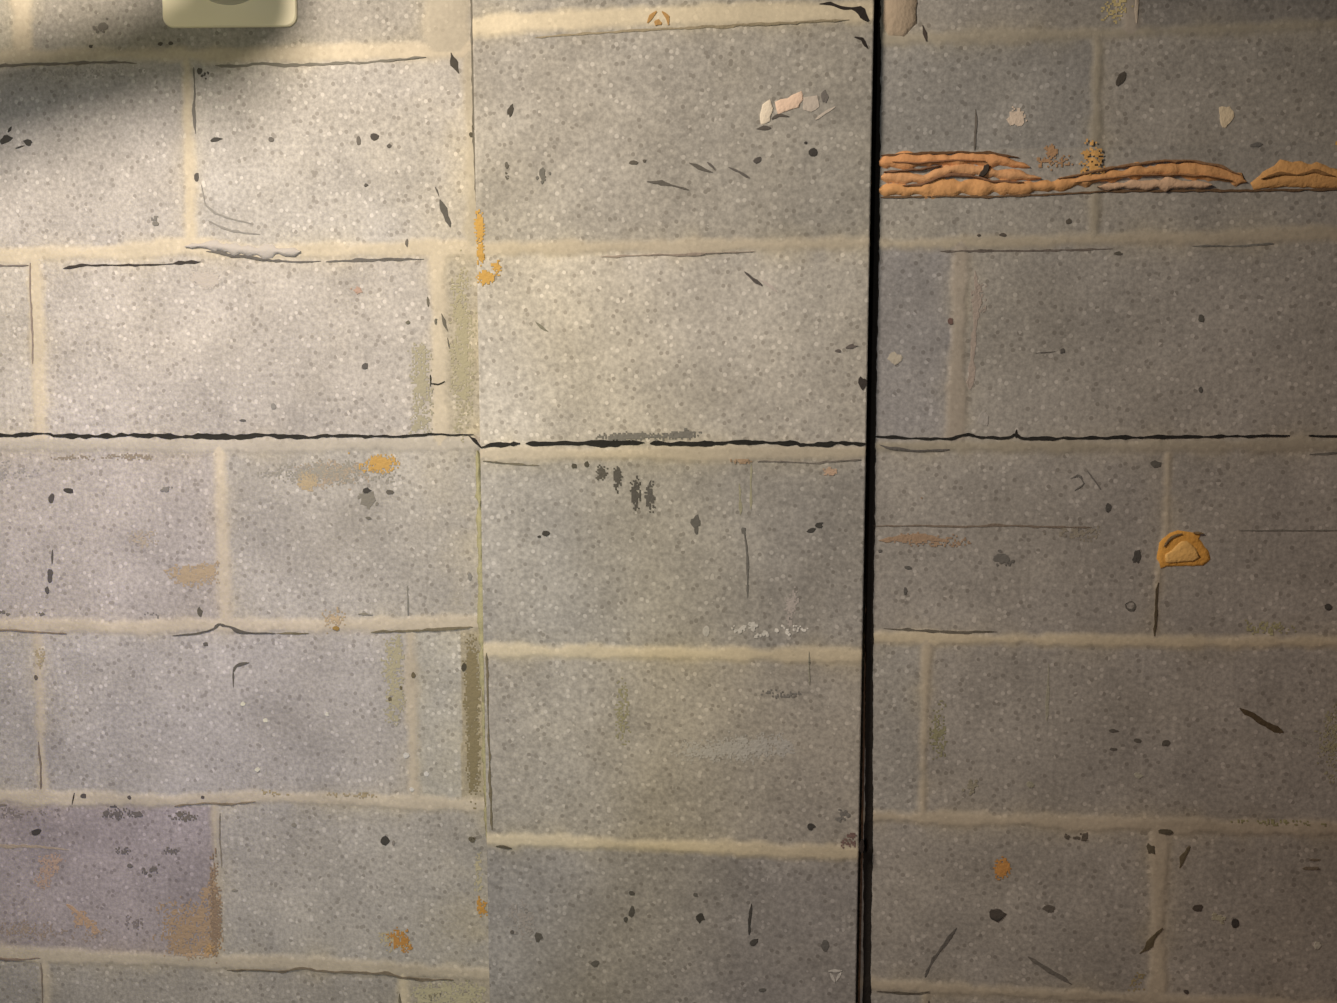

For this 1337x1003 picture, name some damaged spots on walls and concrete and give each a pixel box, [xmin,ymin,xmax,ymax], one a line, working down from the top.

crack [535,19,845,38]
crack [469,0,477,200]
spalling [757,90,835,130]
crack [601,250,755,258]
crack [0,432,644,448]
crack [484,459,539,467]
crack [650,0,1337,1003]
corrosion [1156,530,1210,568]